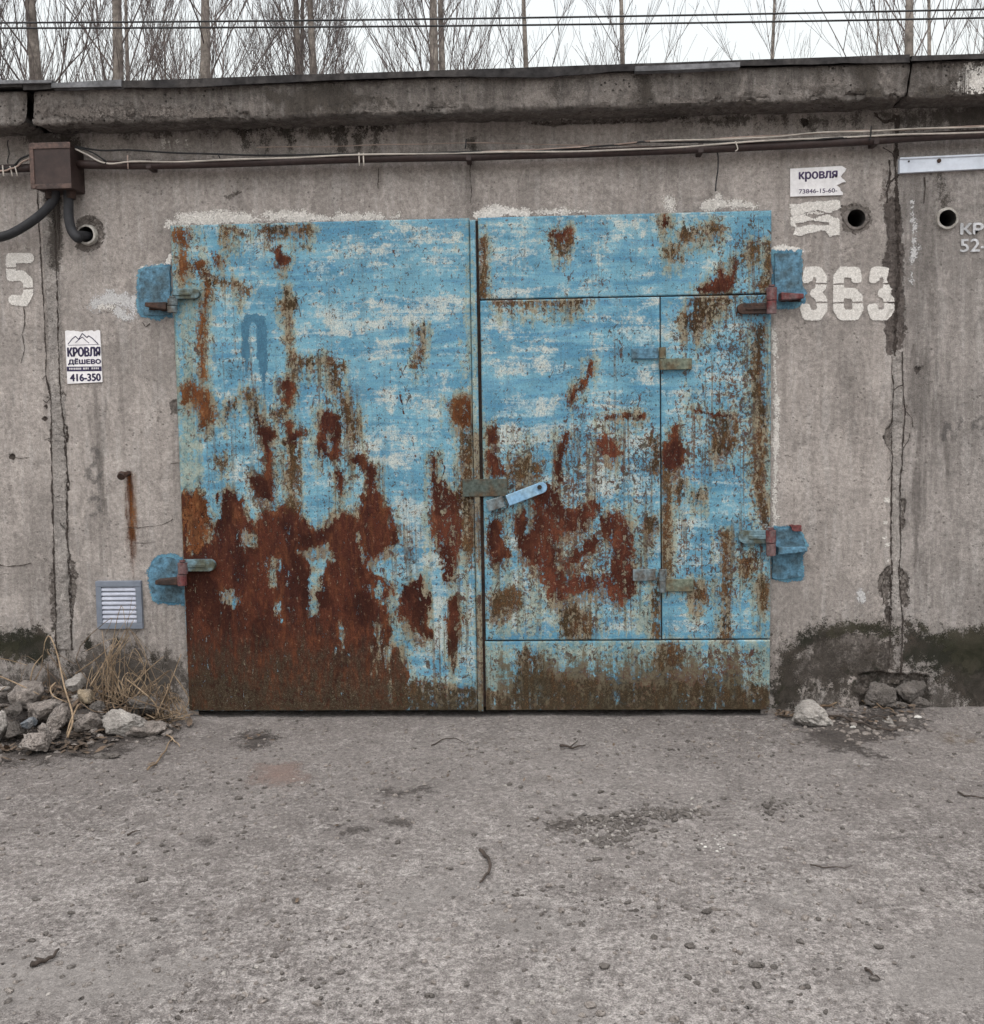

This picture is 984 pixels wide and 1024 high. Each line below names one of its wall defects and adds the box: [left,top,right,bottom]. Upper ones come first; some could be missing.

crack [0,190,73,667]
corrosion [127,472,137,556]
corrosion [171,224,770,710]
damp [768,610,984,711]
crack [874,112,926,673]